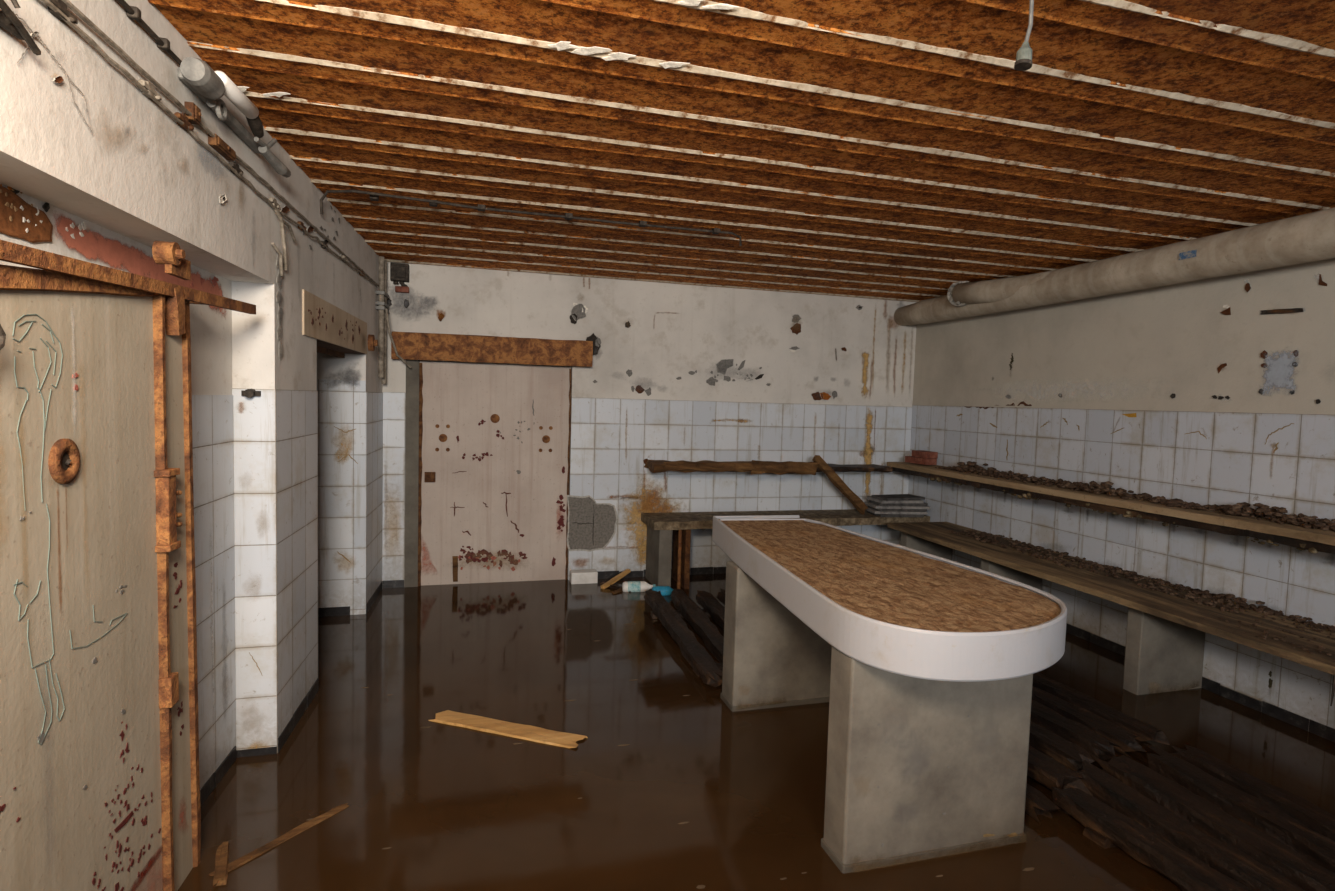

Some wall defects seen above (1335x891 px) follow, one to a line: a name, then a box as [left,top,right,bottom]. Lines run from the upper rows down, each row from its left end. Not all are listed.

corrosion [0,184,53,243]
corrosion [0,264,158,297]
peeling [676,359,771,386]
corrosion [862,411,876,495]
spalling [567,495,618,552]
corrosion [458,546,527,571]